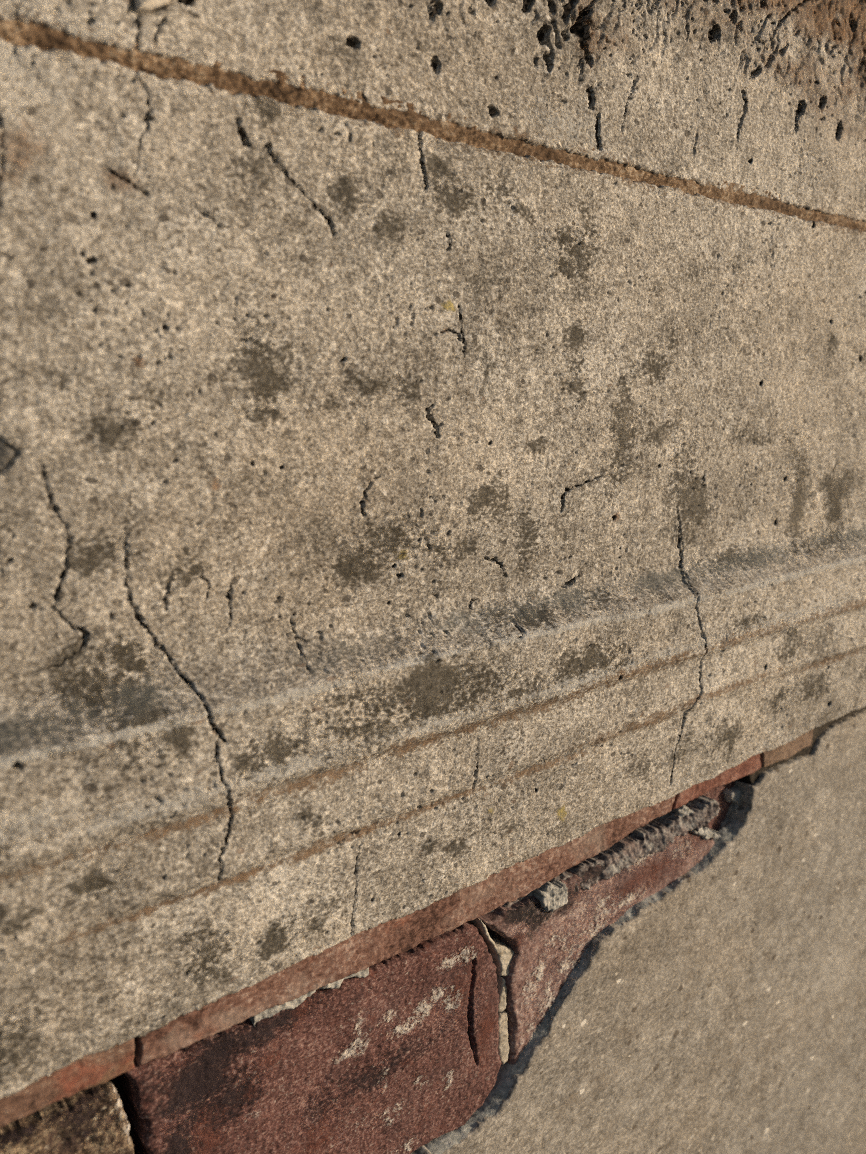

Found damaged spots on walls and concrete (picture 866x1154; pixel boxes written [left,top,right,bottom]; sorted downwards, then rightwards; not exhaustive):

crack [37,465,85,671]
crack [124,527,233,881]
crack [670,506,707,785]
spalling [602,776,762,936]
spalling [424,946,597,1154]